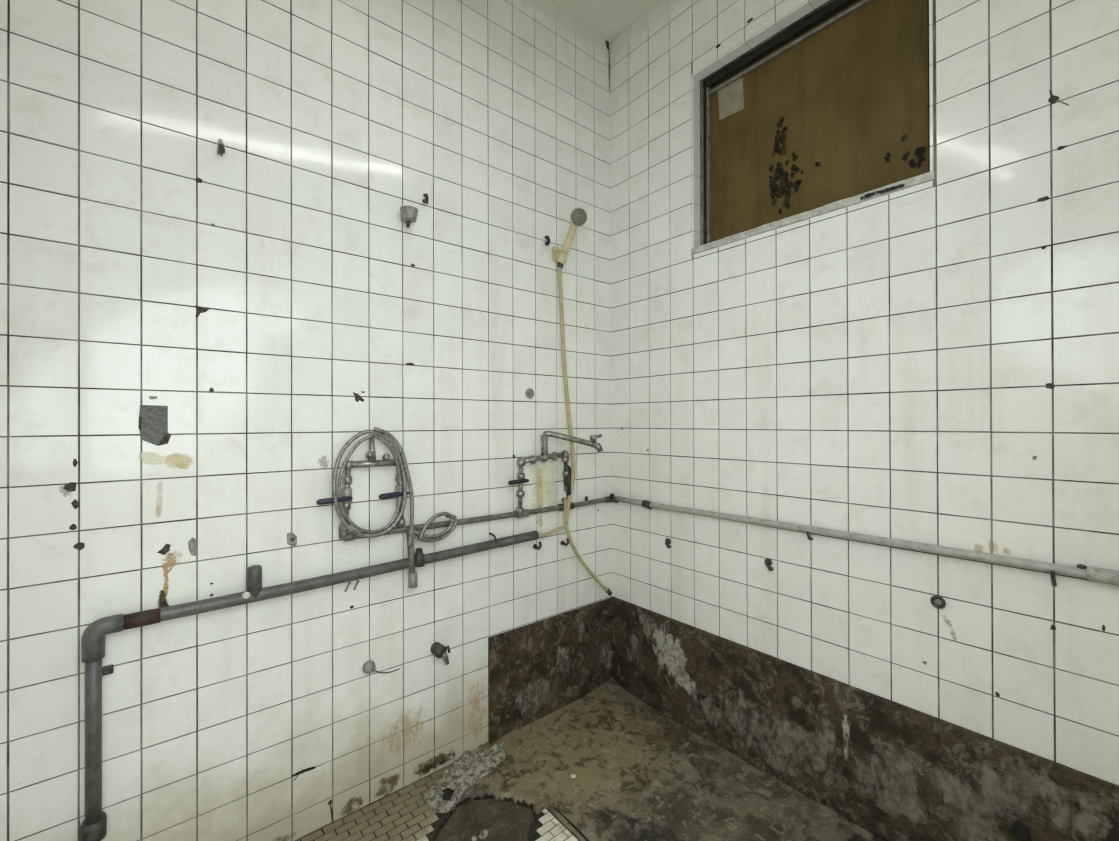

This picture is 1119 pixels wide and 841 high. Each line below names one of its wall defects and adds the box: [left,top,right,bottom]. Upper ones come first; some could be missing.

spalling [138,396,171,446]
rust [157,544,176,608]
leakage [514,645,571,717]
leakage [630,612,1112,841]
leakage [586,805,691,841]